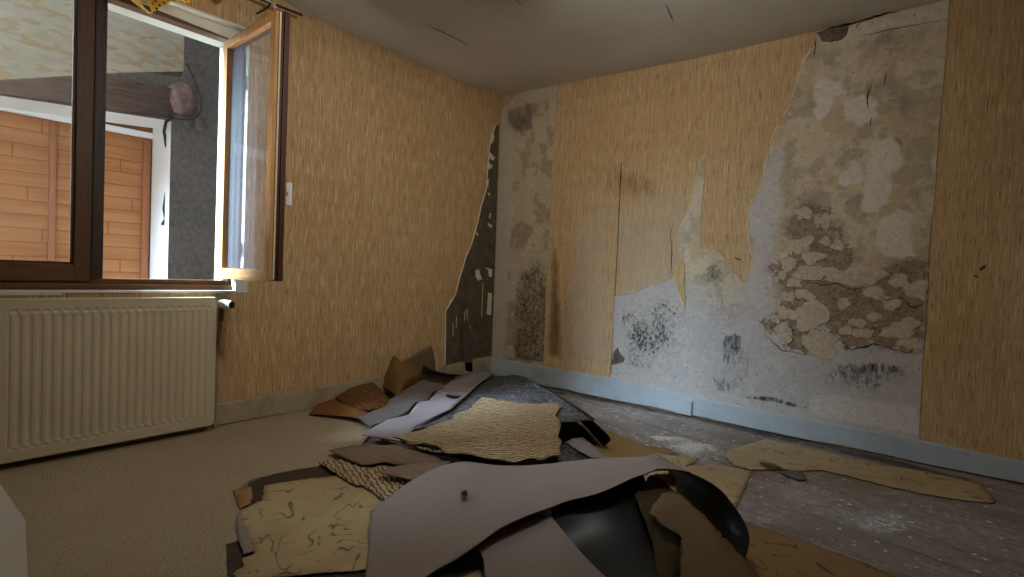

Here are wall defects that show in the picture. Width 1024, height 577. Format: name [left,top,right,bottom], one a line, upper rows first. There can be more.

leakage [513,260,558,362]
flaking render [611,0,950,440]